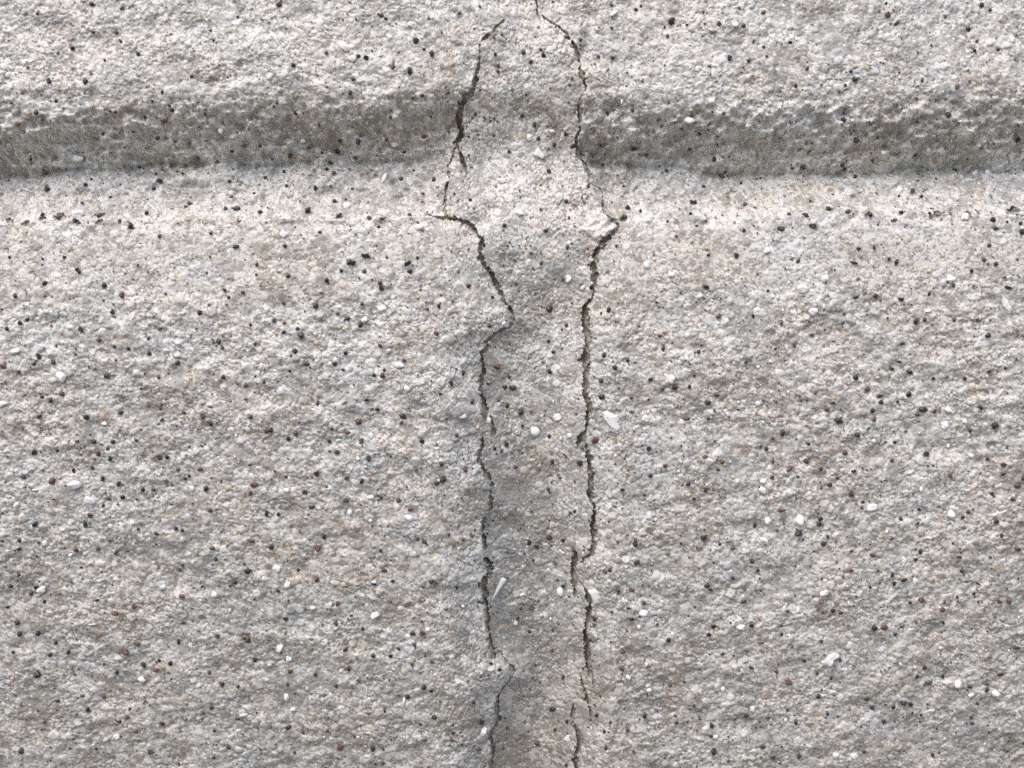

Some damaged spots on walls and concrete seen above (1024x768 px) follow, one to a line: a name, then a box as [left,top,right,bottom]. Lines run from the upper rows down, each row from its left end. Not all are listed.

crack [425,18,516,768]
crack [535,0,627,768]